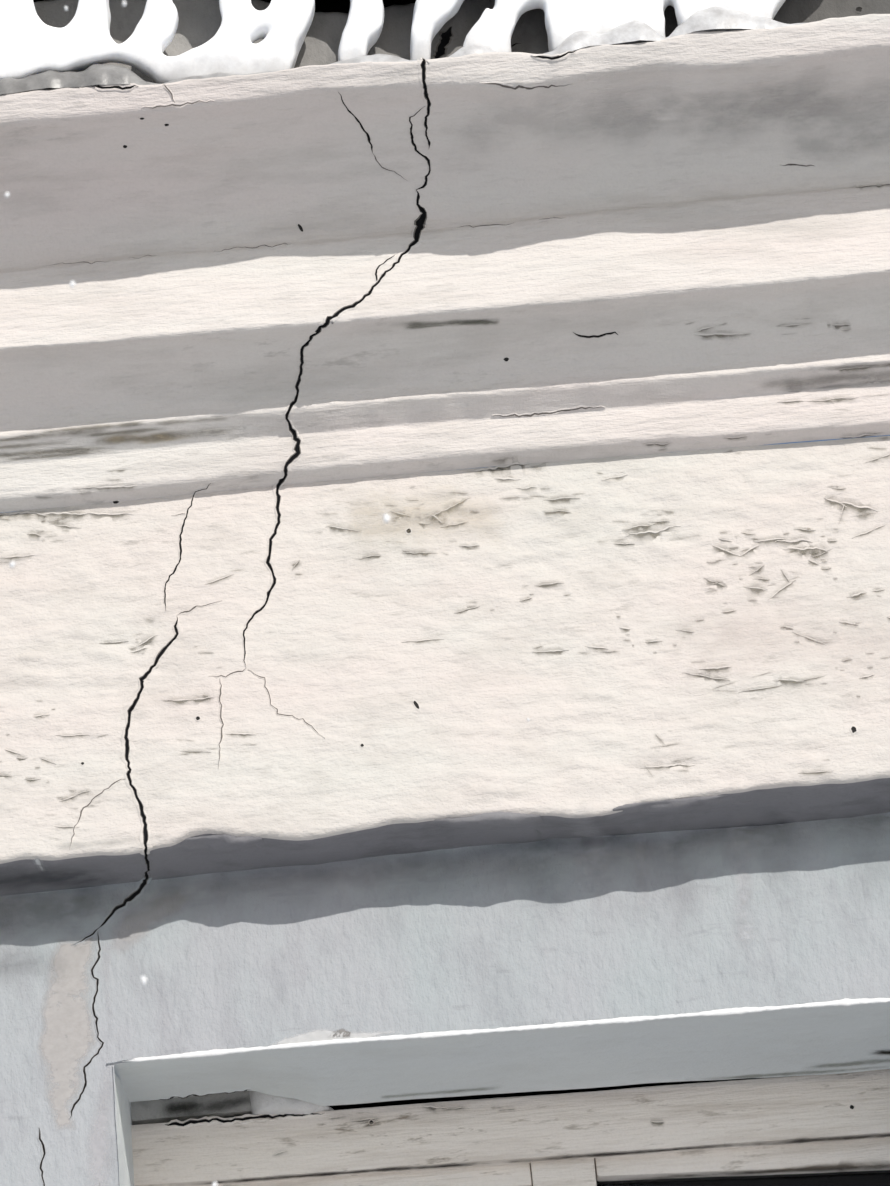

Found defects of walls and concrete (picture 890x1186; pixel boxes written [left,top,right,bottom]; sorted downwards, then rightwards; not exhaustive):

crack [42,255,160,267]
crack [208,27,577,768]
crack [491,405,605,418]
peeling [824,487,878,524]
peeling [613,520,681,546]
peeling [712,528,837,570]
peeling [743,565,795,600]
peeling [682,665,826,693]
crack [69,481,222,1119]
crack [159,1088,325,1129]
crack [37,1127,47,1186]